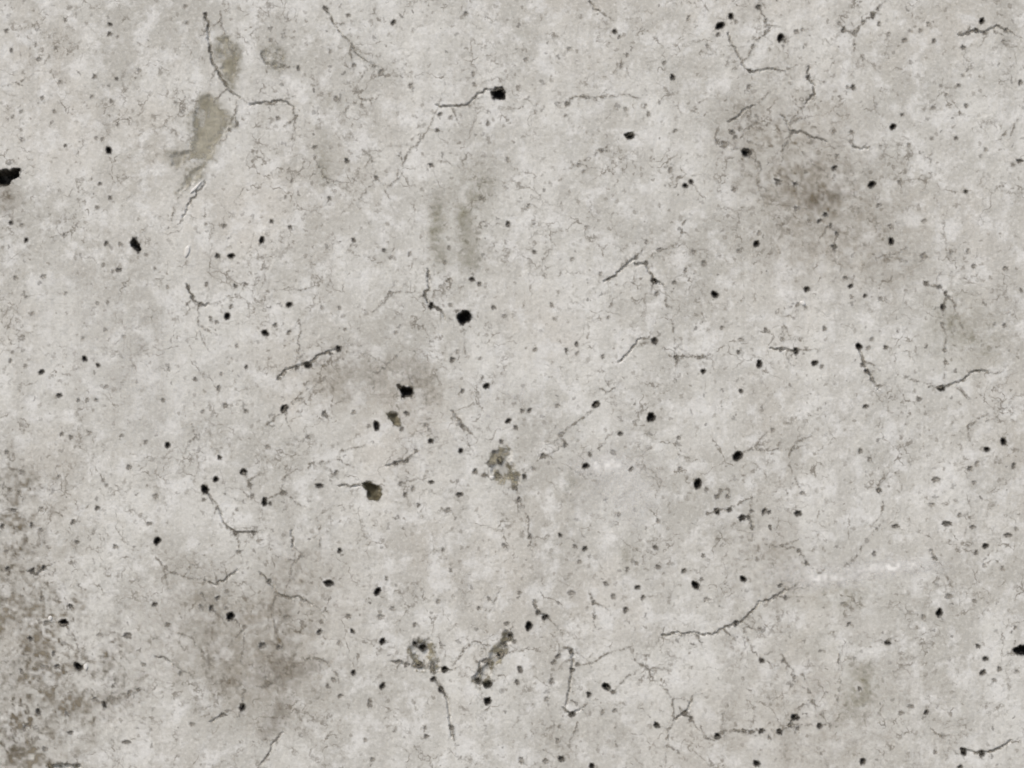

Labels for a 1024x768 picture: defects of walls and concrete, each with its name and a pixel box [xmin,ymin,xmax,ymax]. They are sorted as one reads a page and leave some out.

crack [204,14,300,141]
crack [385,89,487,198]
crack [606,220,704,363]
crack [266,319,329,426]
crack [620,659,758,753]
crack [664,585,838,728]